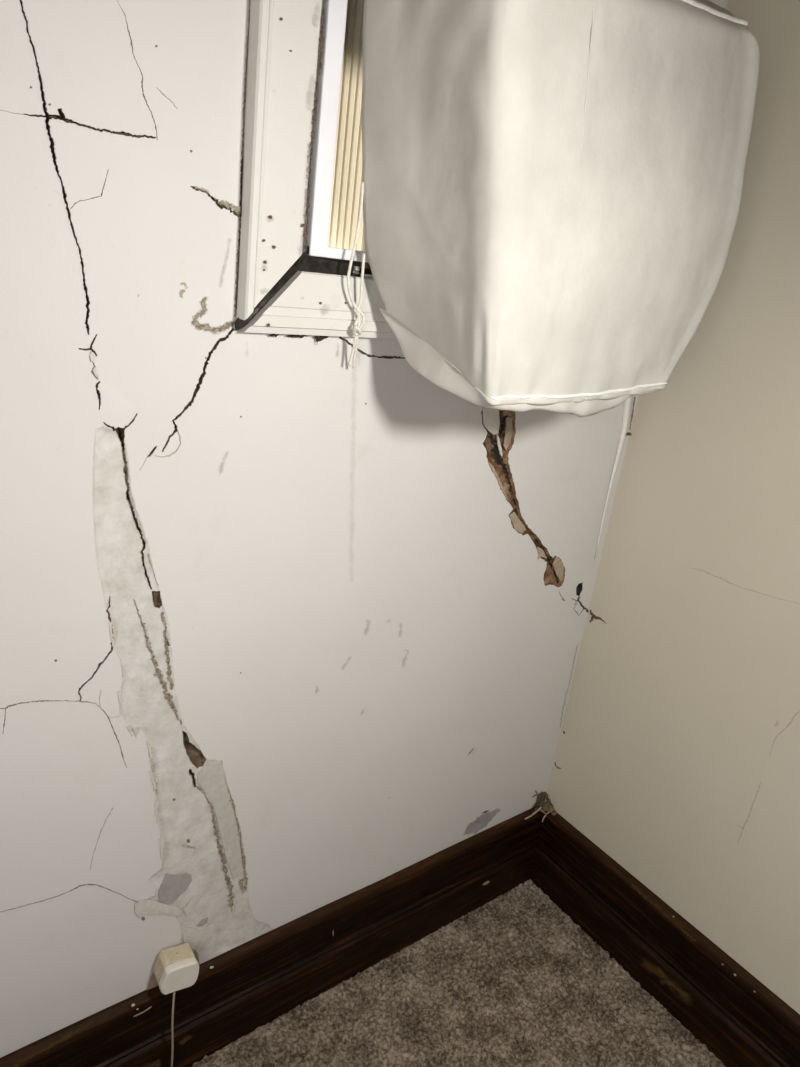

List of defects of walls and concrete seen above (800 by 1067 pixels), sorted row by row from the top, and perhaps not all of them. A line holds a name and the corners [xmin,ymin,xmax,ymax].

crack [0,0,251,589]
crack [0,651,127,767]
peeling [93,426,273,969]
crack [1,808,137,912]
spalling [525,790,557,822]